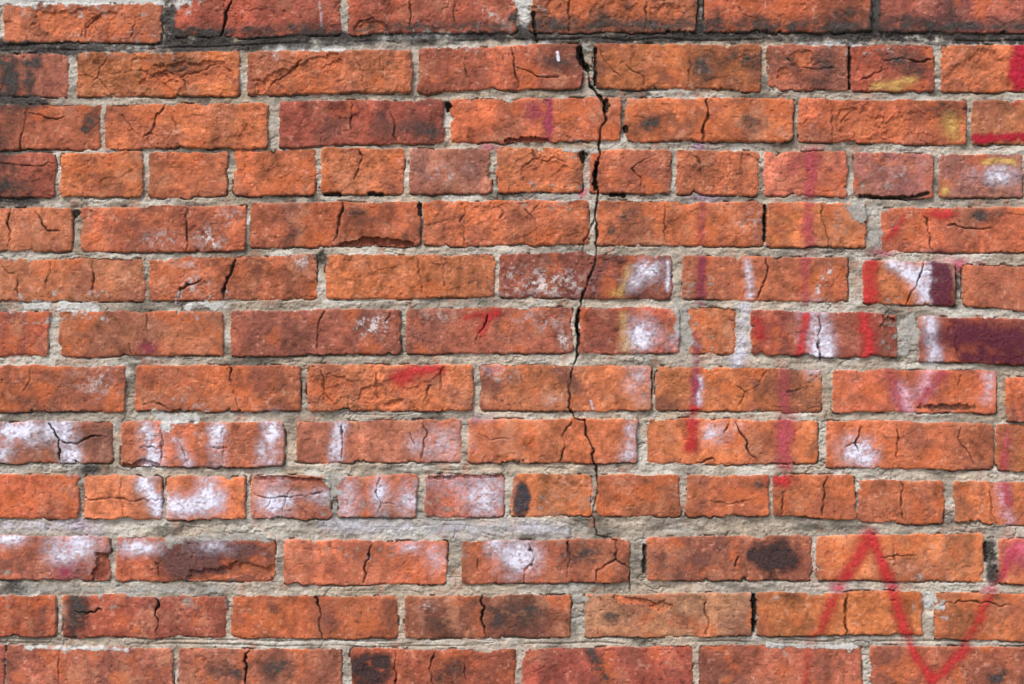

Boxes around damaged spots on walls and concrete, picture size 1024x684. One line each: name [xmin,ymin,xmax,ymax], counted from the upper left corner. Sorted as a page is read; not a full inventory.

crack [179,259,236,299]
crack [568,48,630,583]
leakage [55,422,81,463]
crack [49,423,98,460]
leakage [210,425,224,448]
leakage [260,422,279,463]
leakage [197,483,217,509]